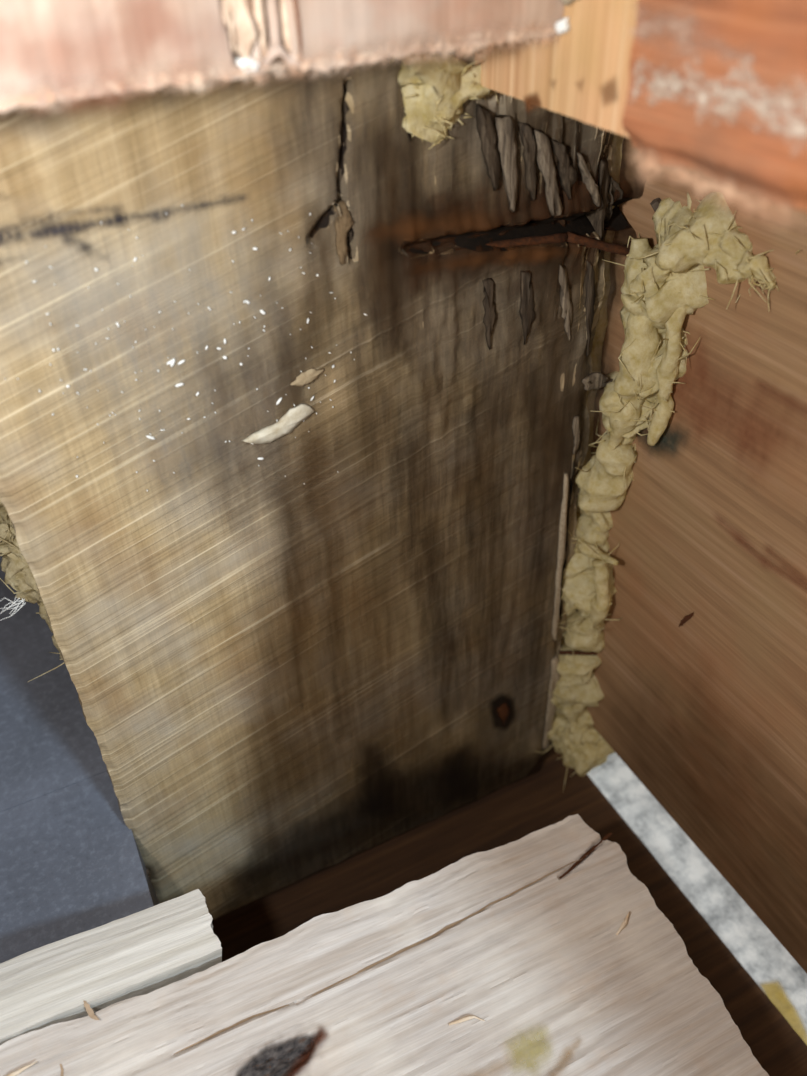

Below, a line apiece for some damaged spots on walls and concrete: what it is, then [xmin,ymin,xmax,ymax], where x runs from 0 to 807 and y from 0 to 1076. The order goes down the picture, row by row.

spalling [220,0,302,73]
water stain [0,215,127,244]
crack [310,82,354,265]
water stain [298,70,616,739]
water stain [235,524,545,903]
crack [173,833,612,1055]